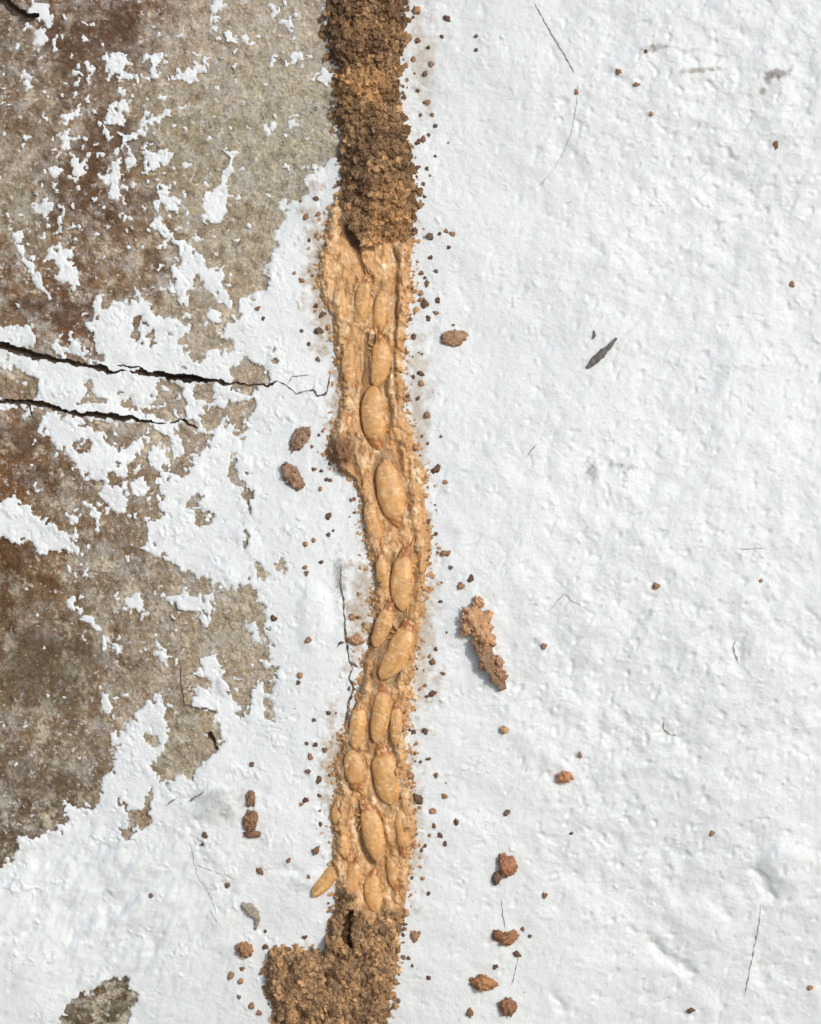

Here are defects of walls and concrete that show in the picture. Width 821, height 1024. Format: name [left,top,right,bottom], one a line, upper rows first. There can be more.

crack [0,341,331,397]
crack [0,399,198,429]
peeling [0,0,341,868]
peeling [59,976,138,1024]